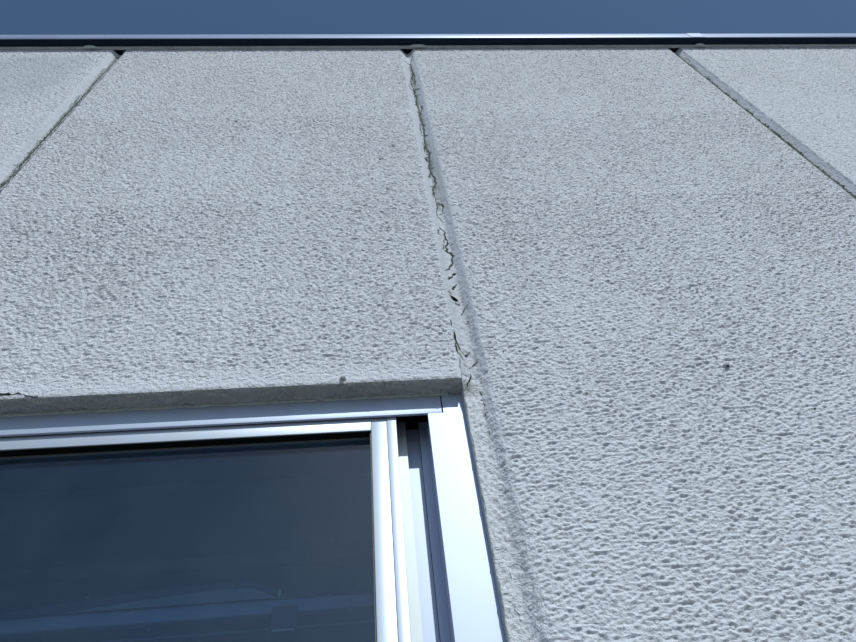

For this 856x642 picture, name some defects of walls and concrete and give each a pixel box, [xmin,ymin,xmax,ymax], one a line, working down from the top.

crack [0,391,38,399]
crack [406,53,491,456]